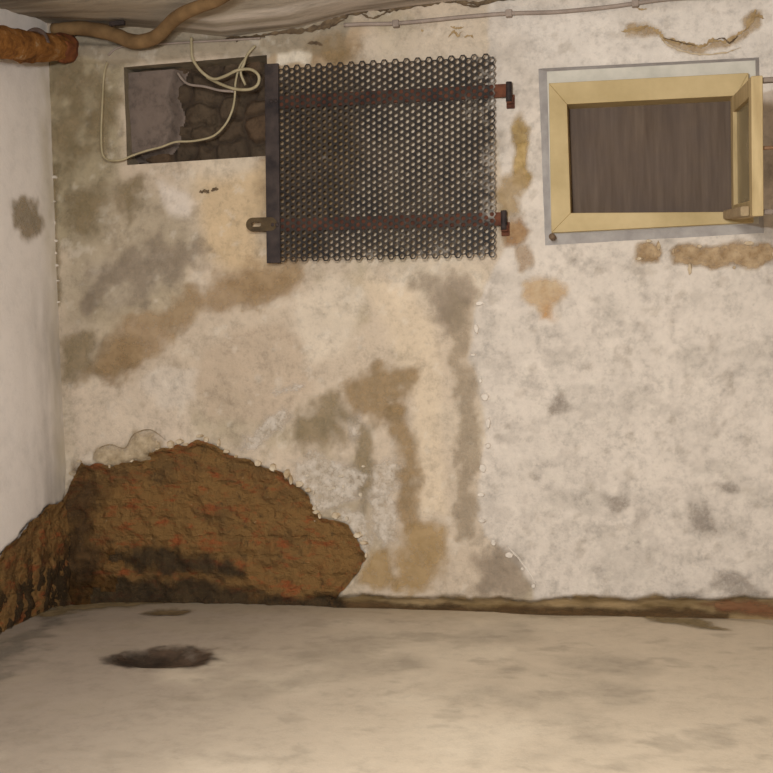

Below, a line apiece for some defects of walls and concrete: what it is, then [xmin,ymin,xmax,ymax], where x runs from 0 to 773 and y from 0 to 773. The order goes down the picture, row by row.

leakage [14,197,41,237]
spalling [636,239,661,262]
spalling [671,241,773,275]
leakage [64,262,300,377]
leakage [296,363,444,591]
spalling [0,434,773,634]